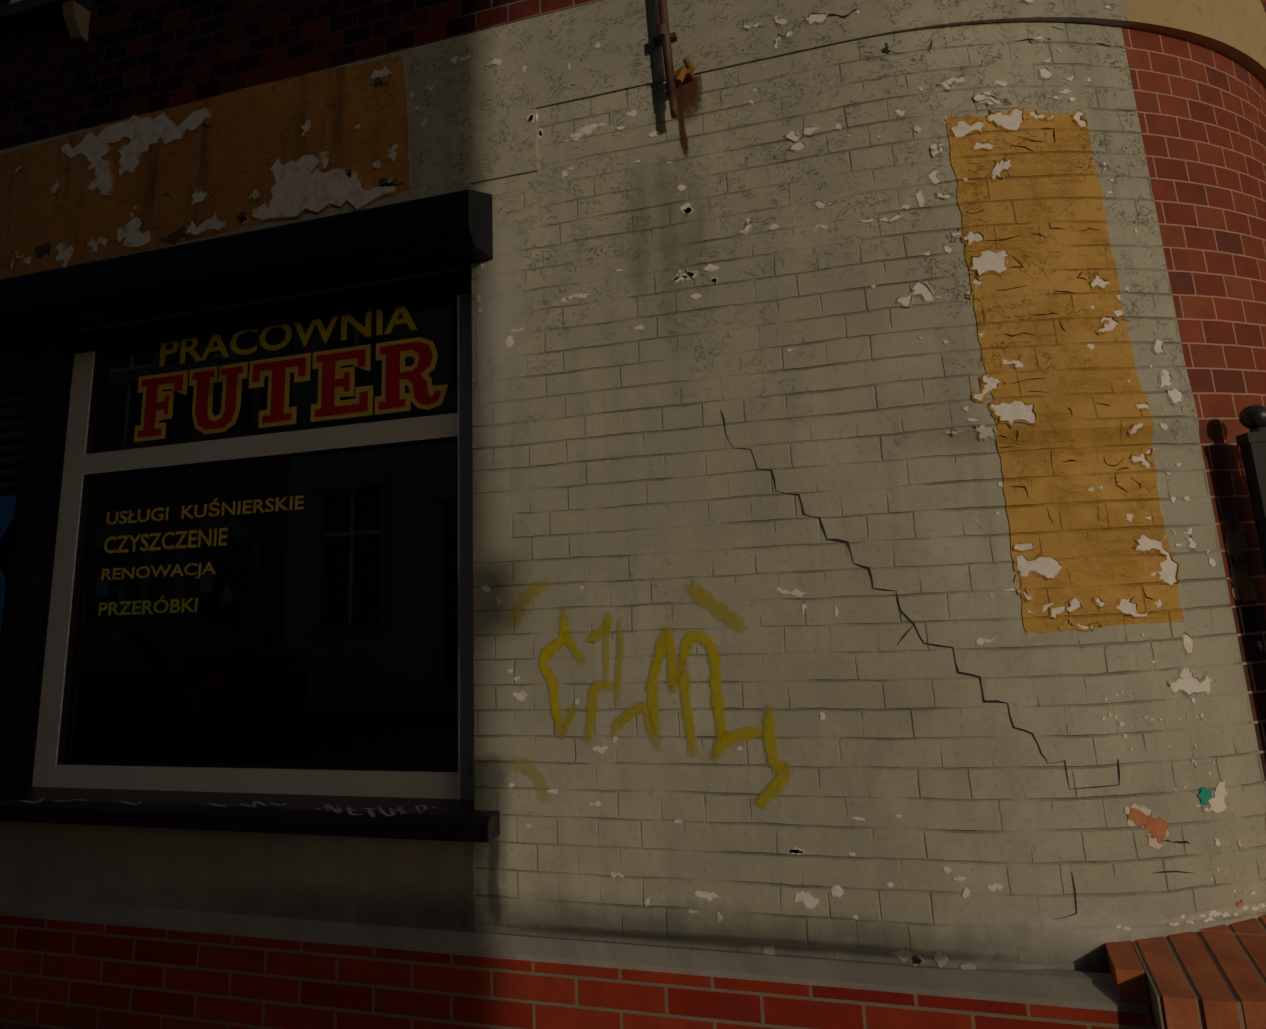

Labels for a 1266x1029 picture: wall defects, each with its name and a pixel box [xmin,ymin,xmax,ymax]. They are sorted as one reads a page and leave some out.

peeling [58,105,213,198]
peeling [8,119,405,270]
rust [676,76,701,154]
peeling [859,33,1090,224]
crack [1013,128,1055,153]
peeling [922,228,1012,299]
crack [968,210,1098,290]
crack [1003,271,1086,337]
peeling [944,354,1039,443]
crack [1063,457,1141,491]
crack [721,411,1120,789]
peeling [1006,541,1162,637]